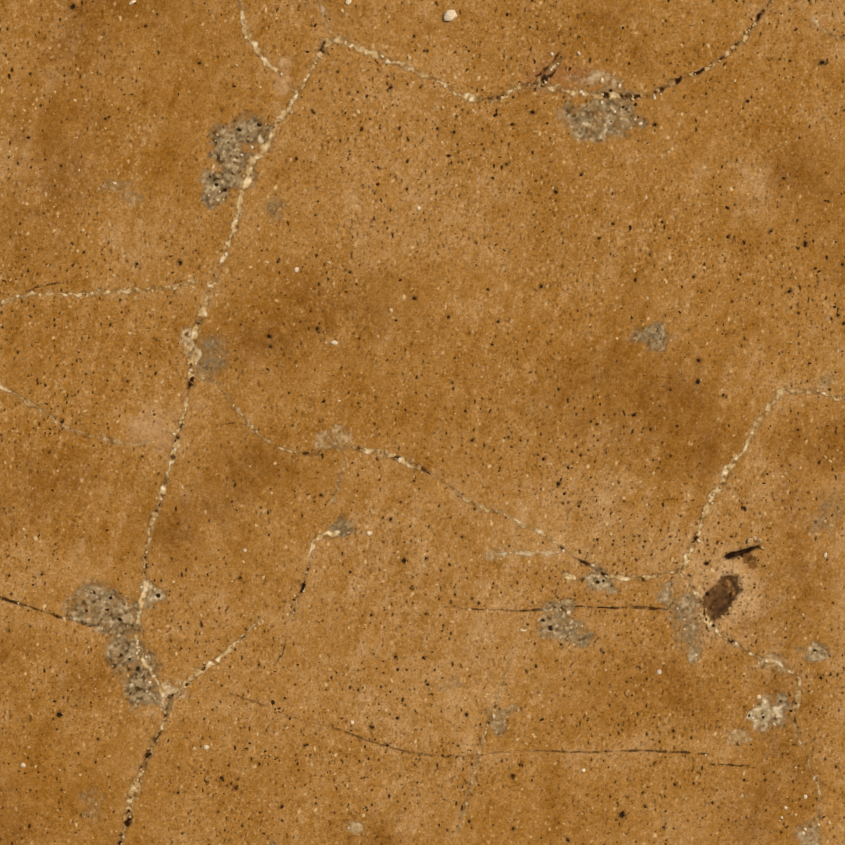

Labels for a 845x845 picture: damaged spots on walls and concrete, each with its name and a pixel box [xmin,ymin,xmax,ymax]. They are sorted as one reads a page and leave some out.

spalling [564,70,656,142]
spalling [200,118,271,209]
crack [1,0,773,387]
crack [0,382,58,423]
crack [1,597,98,626]
spalling [66,582,184,709]
crack [115,399,262,845]
crack [226,388,845,829]
spalling [538,600,593,647]
spalling [747,694,793,730]